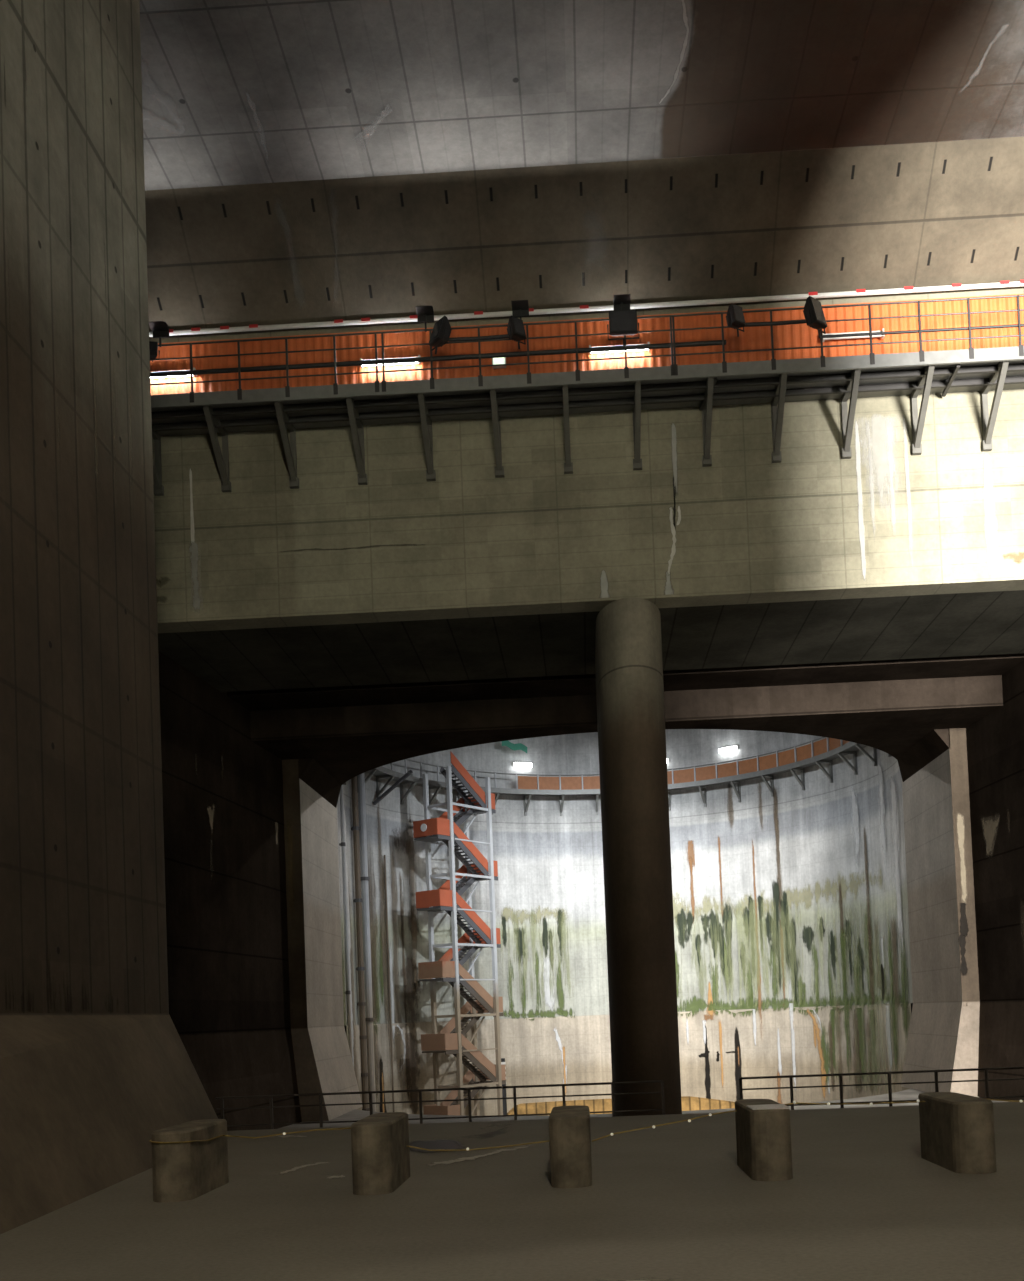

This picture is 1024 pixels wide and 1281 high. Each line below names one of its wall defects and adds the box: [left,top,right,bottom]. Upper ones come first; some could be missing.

crack [659,0,689,104]
crack [665,423,681,595]
water stain [855,421,866,579]